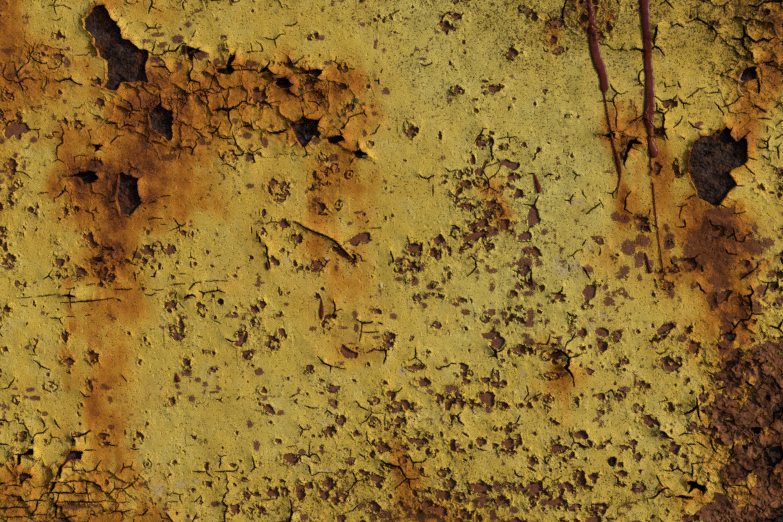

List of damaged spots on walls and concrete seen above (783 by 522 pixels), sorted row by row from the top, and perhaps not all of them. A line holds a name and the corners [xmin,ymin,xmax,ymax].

crack [0,101,142,163]
spalling [74,0,149,107]
crack [120,0,195,102]
crack [178,61,307,168]
crack [226,22,297,76]
crack [600,0,783,186]
spalling [674,116,758,206]
rust [0,0,398,522]
crack [295,222,365,267]
rust [572,0,783,482]
crack [193,455,258,522]
rust [658,481,725,522]